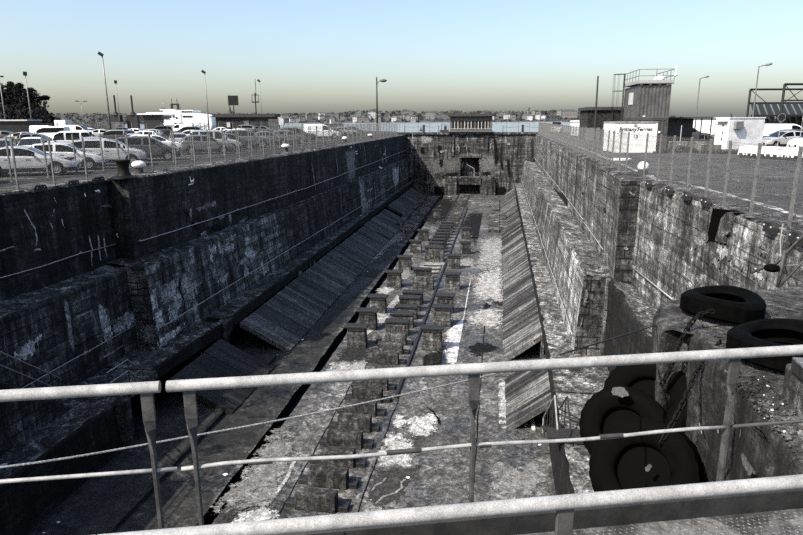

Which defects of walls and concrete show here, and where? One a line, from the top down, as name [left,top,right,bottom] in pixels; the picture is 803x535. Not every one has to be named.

spalling [691,227,767,281]